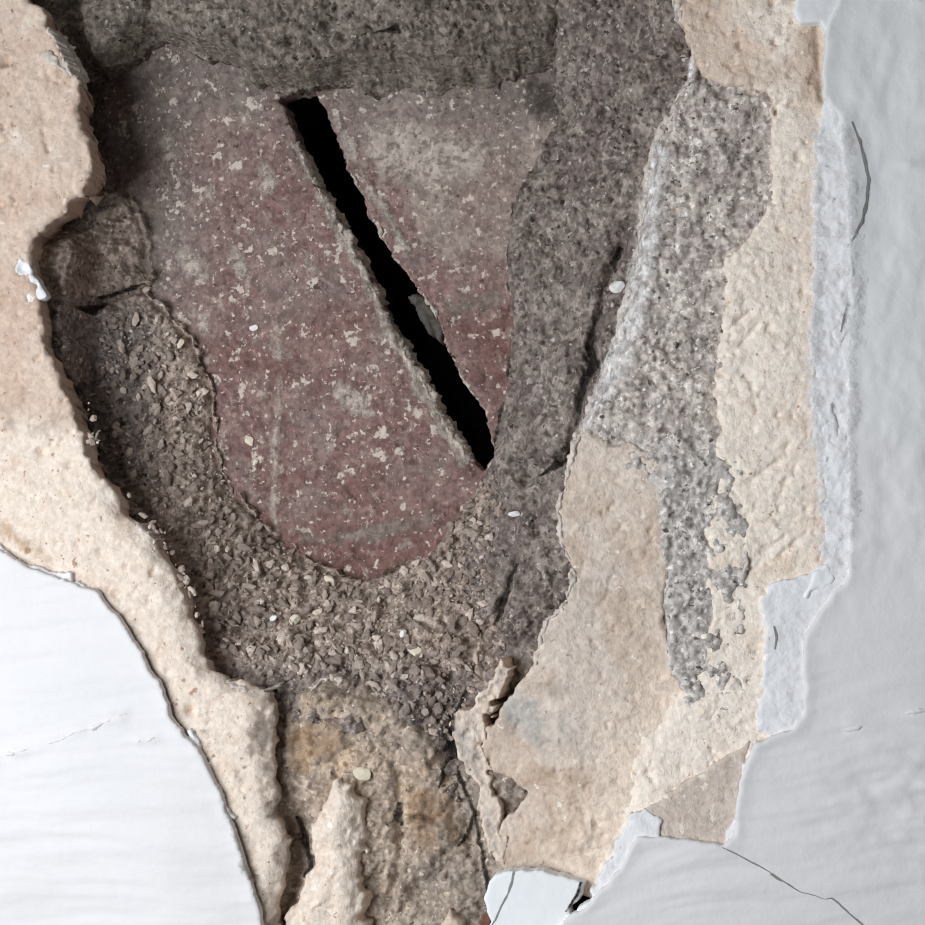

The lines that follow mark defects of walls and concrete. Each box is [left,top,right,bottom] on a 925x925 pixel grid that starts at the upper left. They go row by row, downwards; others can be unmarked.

spalling [0,0,663,925]
crack [287,96,495,469]
spalling [454,0,864,898]
crack [847,122,870,274]
crack [438,687,515,925]
crack [722,847,863,925]